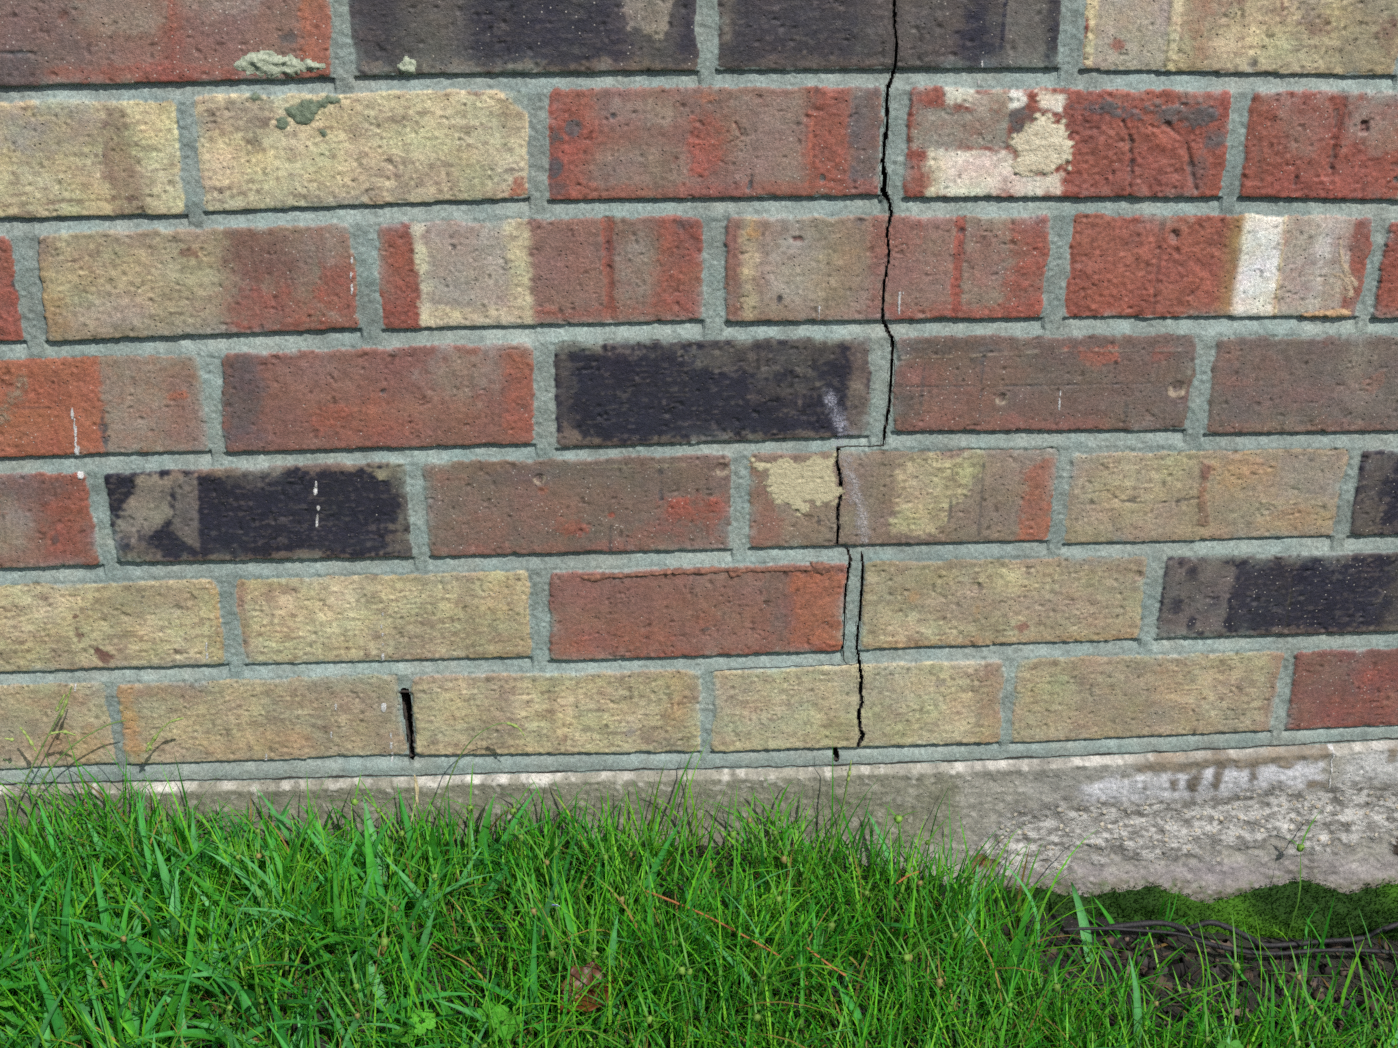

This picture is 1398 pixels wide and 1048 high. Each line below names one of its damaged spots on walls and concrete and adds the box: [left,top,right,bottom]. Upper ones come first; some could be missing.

crack [0,0,1398,785]
damp [1139,744,1330,792]